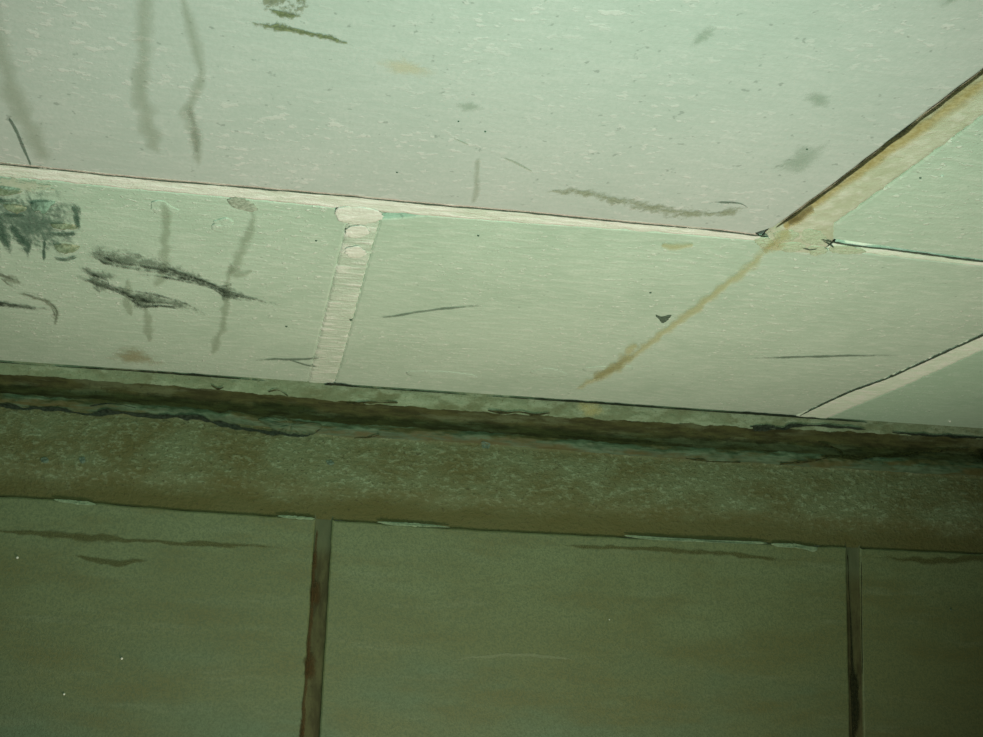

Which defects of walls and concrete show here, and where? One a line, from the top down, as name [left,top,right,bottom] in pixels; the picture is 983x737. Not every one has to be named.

water stain [0,194,81,261]
water stain [85,247,272,311]